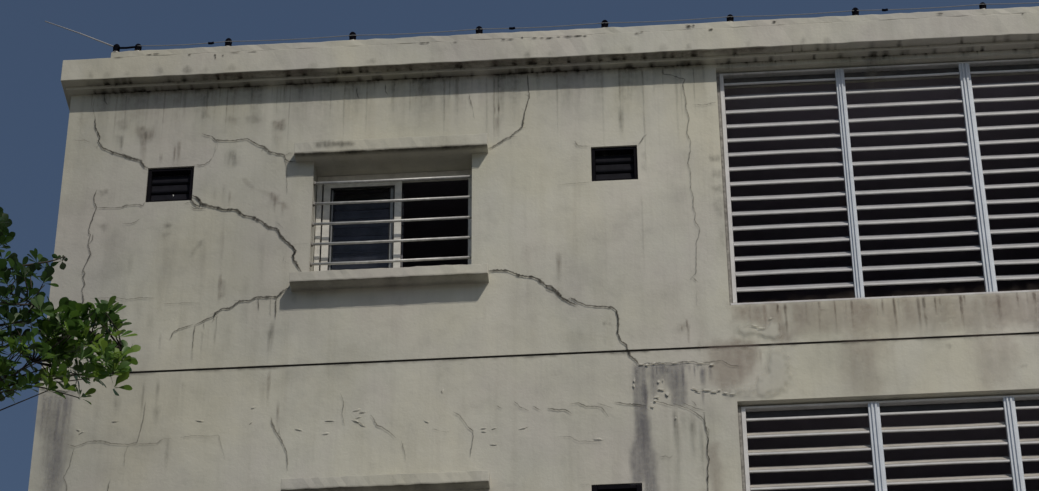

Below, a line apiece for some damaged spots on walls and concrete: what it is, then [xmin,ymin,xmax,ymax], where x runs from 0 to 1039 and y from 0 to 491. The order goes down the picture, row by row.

crack [94,119,147,168]
crack [201,134,292,165]
crack [490,82,530,148]
crack [171,195,301,347]
crack [489,269,735,366]
crack [499,402,710,491]